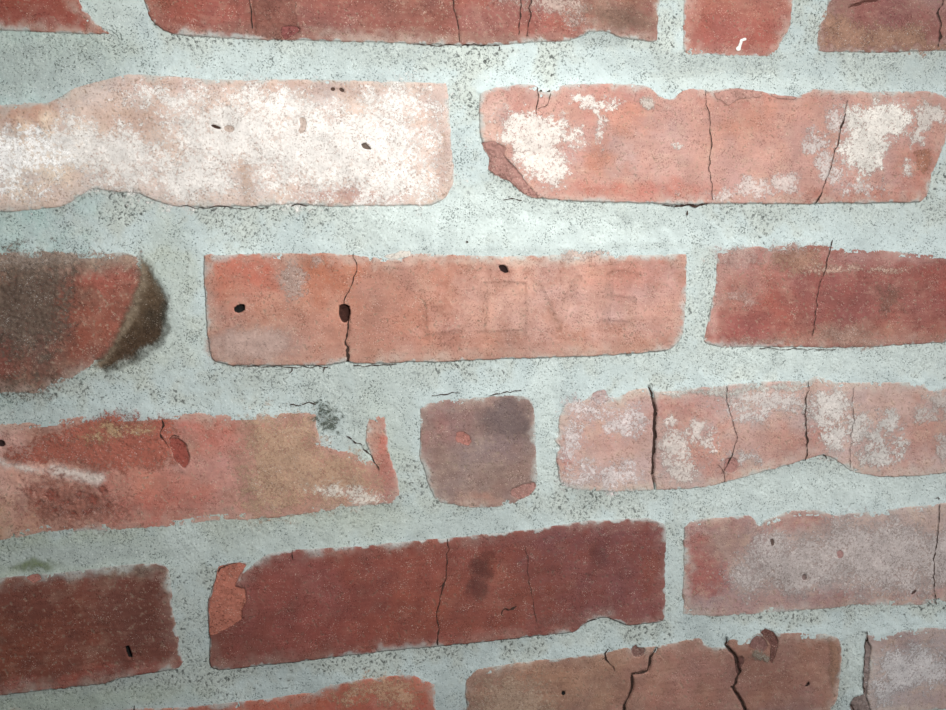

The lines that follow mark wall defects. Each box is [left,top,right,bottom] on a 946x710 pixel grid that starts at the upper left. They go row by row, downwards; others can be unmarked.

water stain [0,73,462,215]
spalling [482,141,538,197]
efflorescence [489,92,621,195]
crack [815,100,848,204]
efflorescence [802,94,946,198]
crack [344,259,357,362]
crack [648,387,657,489]
water stain [556,392,770,496]
water stain [706,384,946,470]
spalling [209,562,246,635]
crack [602,648,656,710]
crack [725,639,746,710]